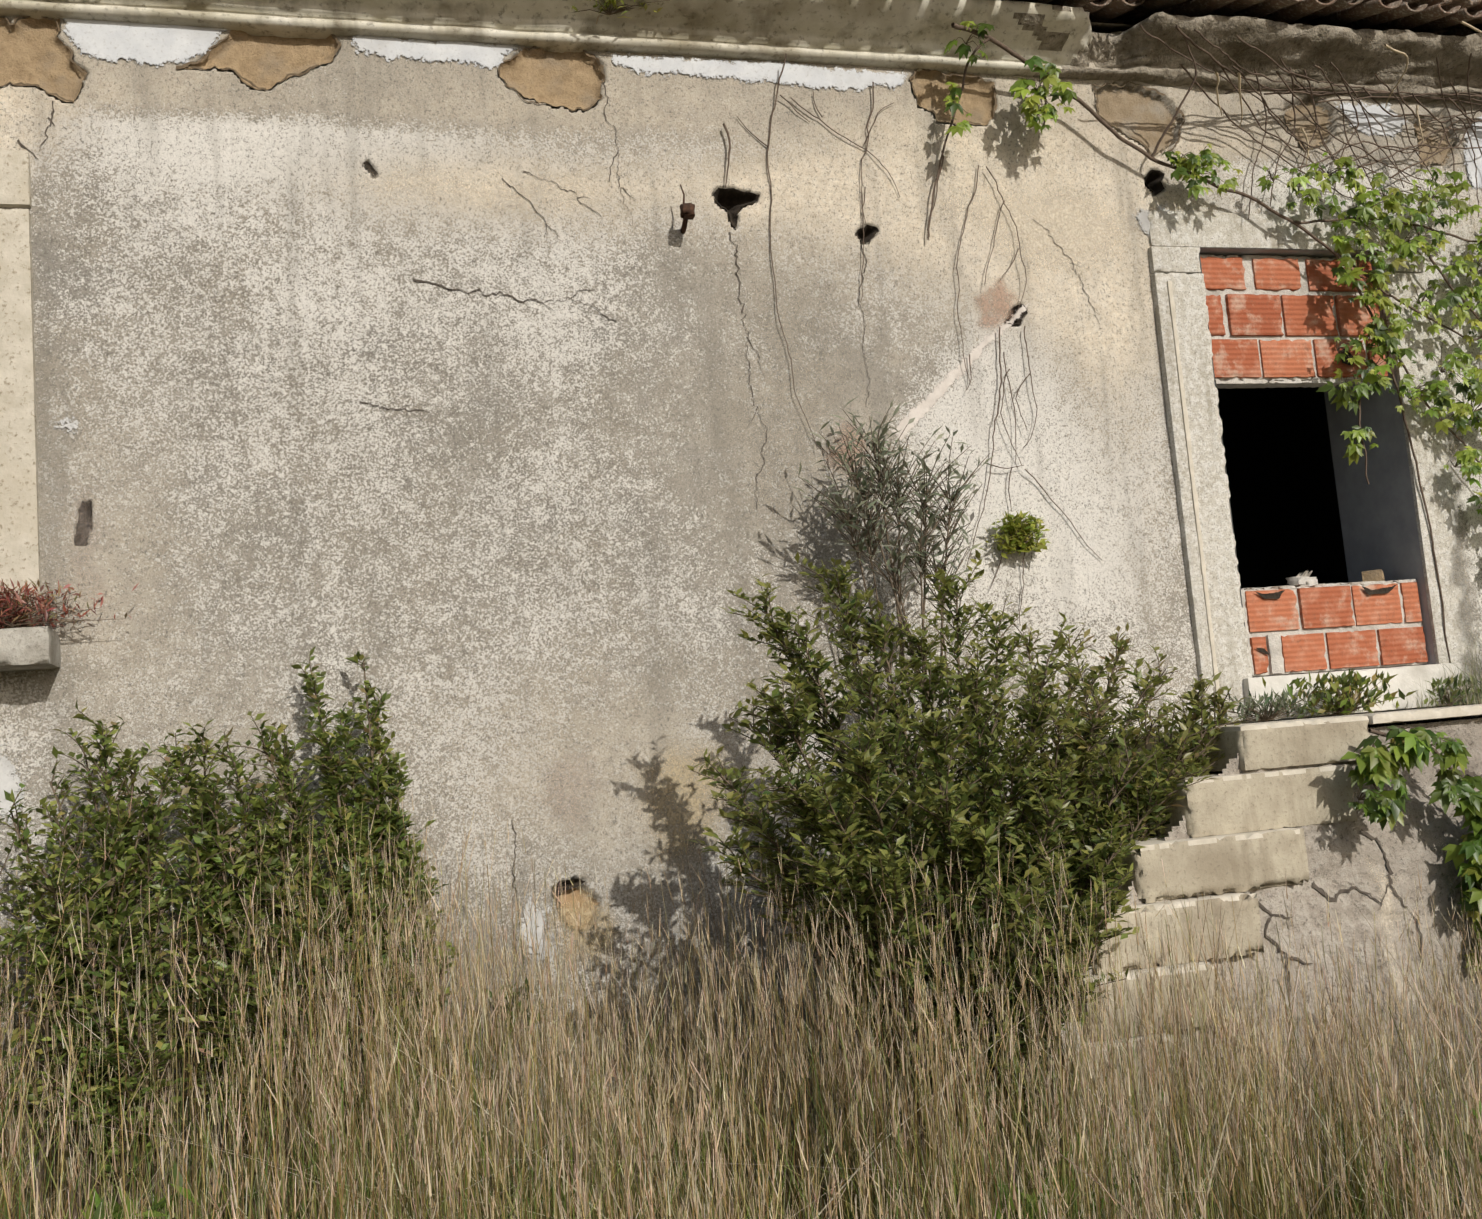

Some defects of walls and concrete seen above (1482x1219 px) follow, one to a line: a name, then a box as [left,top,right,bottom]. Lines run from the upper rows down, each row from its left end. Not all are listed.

flaking render [0,15,998,126]
crack [413,278,616,321]
spalling [713,187,760,227]
crack [729,232,767,503]
crack [858,245,870,402]
spalling [856,225,879,243]
crack [1033,219,1100,324]
peeling [514,879,600,964]
crack [1258,829,1422,975]